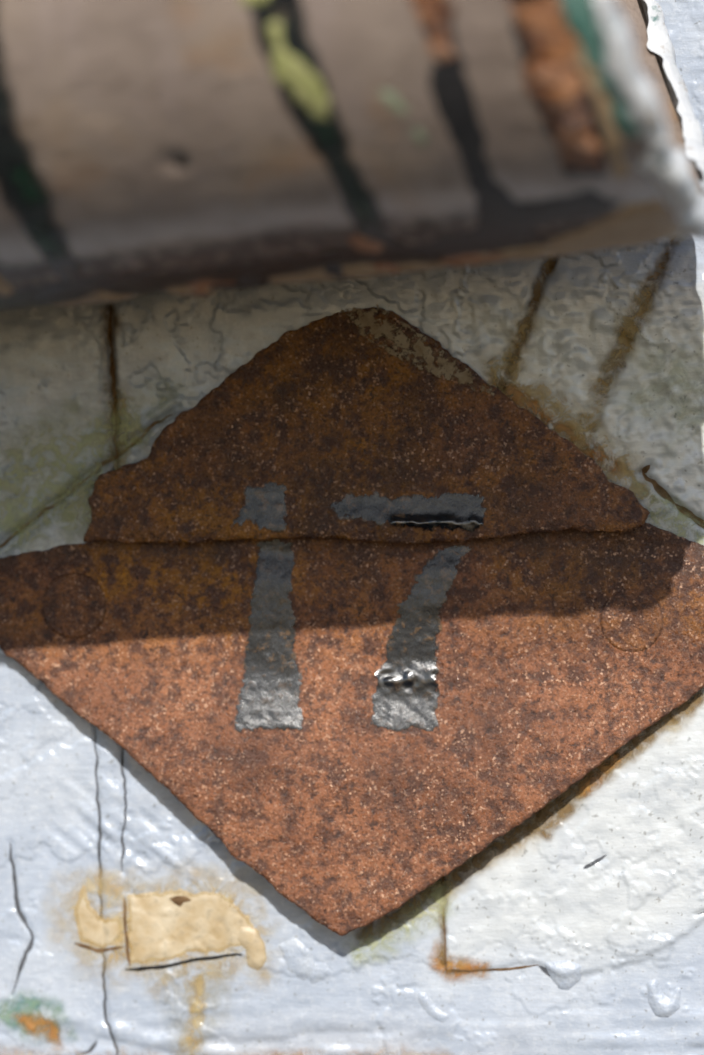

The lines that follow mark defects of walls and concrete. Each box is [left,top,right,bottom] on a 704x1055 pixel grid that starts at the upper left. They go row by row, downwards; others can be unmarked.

crack [0,305,173,548]
corrosion [50,289,137,471]
corrosion [488,200,681,499]
crack [642,465,704,529]
crack [9,842,34,995]
crack [77,947,119,1055]
crack [94,726,127,919]
corrosion [72,878,174,963]
corrosion [357,692,704,978]